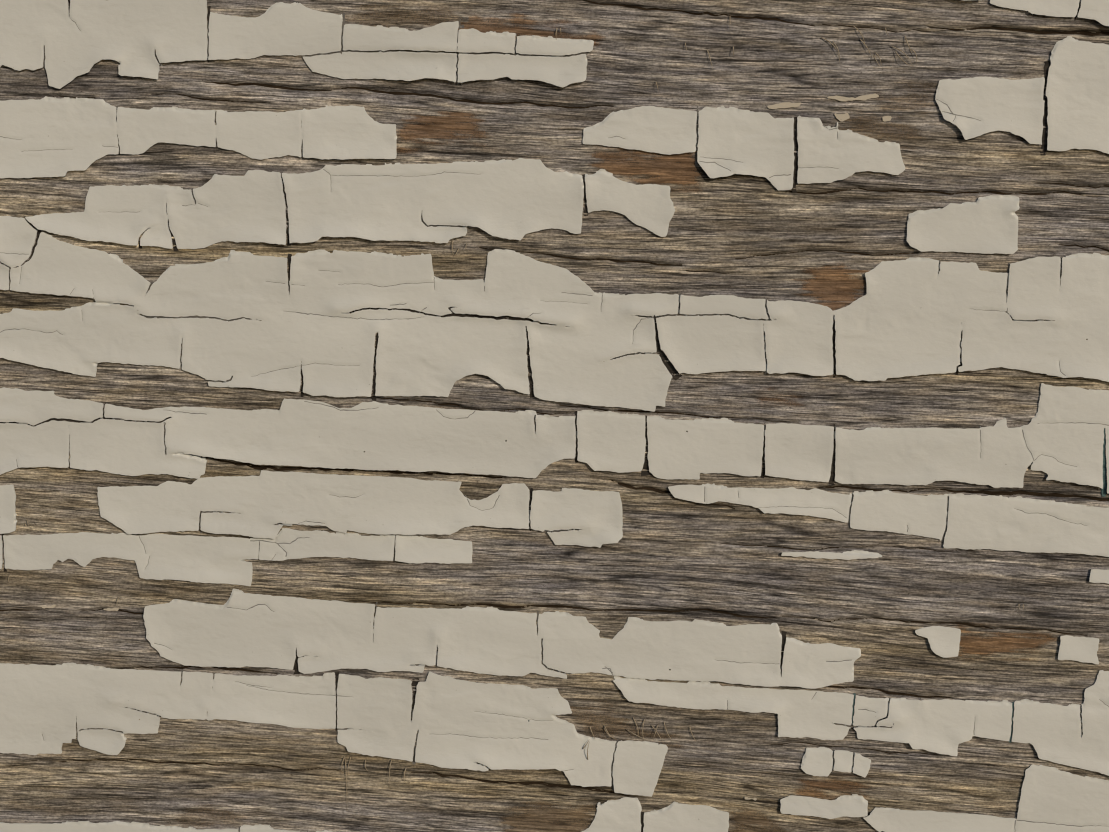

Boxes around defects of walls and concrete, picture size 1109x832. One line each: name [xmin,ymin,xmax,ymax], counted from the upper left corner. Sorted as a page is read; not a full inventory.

peeling [0,0,594,89]
crack [152,6,614,149]
crack [576,0,1109,36]
peeling [935,36,1109,154]
crack [1040,61,1051,155]
peeling [990,0,1109,26]
crack [765,117,1109,197]
peeling [0,94,1109,412]
crack [140,282,262,322]
crack [181,154,1109,551]
crack [0,403,207,454]
peeling [0,383,1109,832]